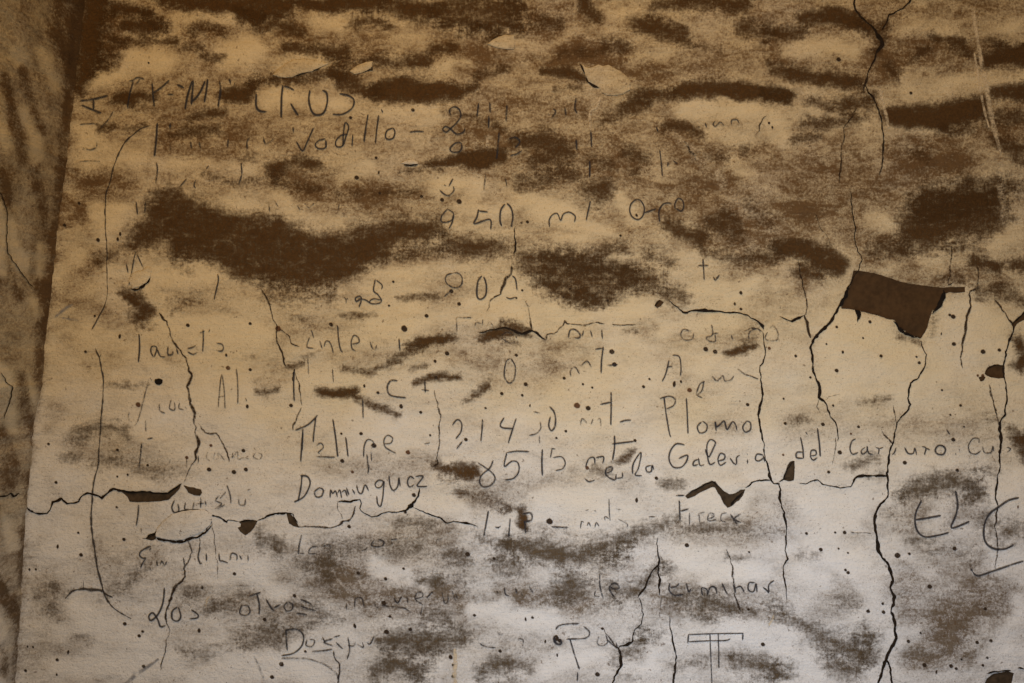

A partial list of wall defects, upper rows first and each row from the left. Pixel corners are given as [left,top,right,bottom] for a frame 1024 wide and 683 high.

crack [480,228,636,340]
crack [669,0,927,683]
flaking render [839,271,965,338]
crack [948,249,1015,565]
flaking render [979,364,1005,381]
flaking render [116,484,202,508]
flaking render [238,520,257,535]
crack [143,488,476,669]
crack [604,538,677,683]
flaking render [685,481,745,508]